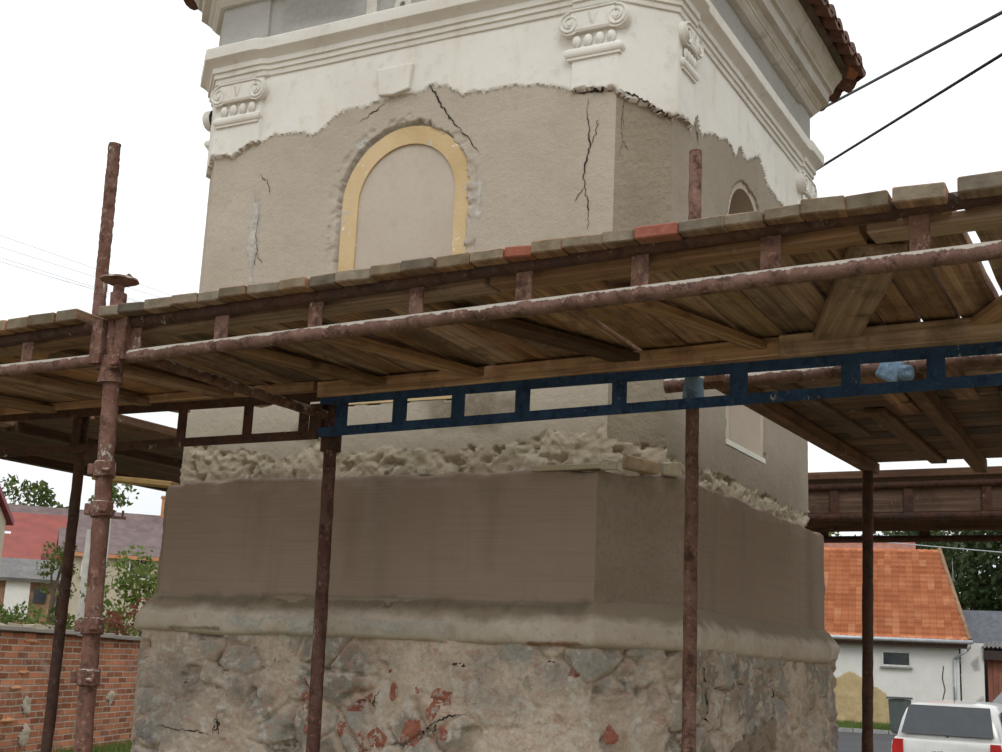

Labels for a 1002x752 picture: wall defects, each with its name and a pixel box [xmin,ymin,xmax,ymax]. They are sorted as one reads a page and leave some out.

crack [429,84,479,152]
flaking render [199,83,783,292]
crack [573,87,699,229]
flaking render [180,402,324,484]
flaking render [335,379,686,479]
flaking render [698,389,810,528]